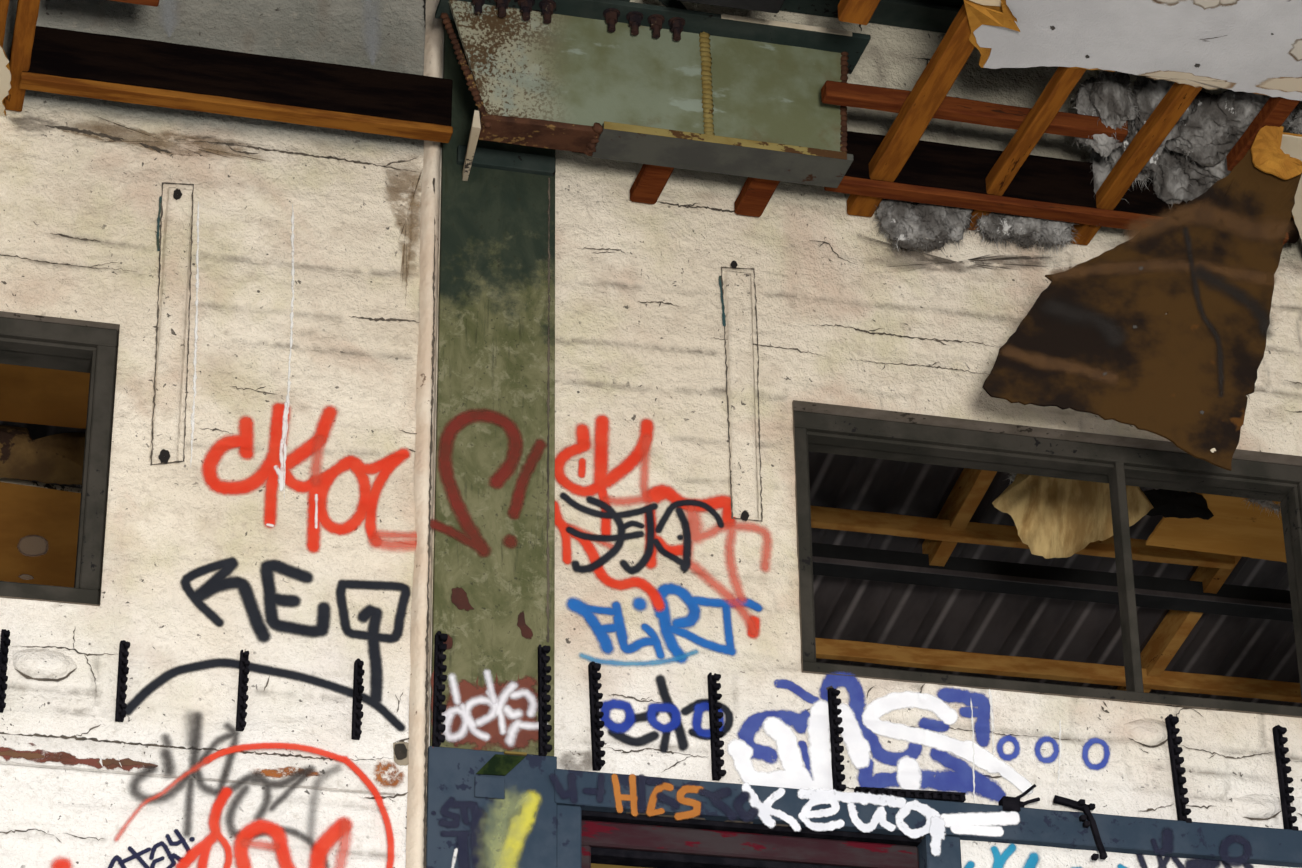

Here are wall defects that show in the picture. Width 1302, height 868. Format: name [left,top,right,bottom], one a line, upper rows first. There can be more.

water stain [1152,0,1239,10]
water stain [1289,39,1302,61]
water stain [1141,71,1236,90]
water stain [1256,77,1302,93]
crack [0,125,435,868]